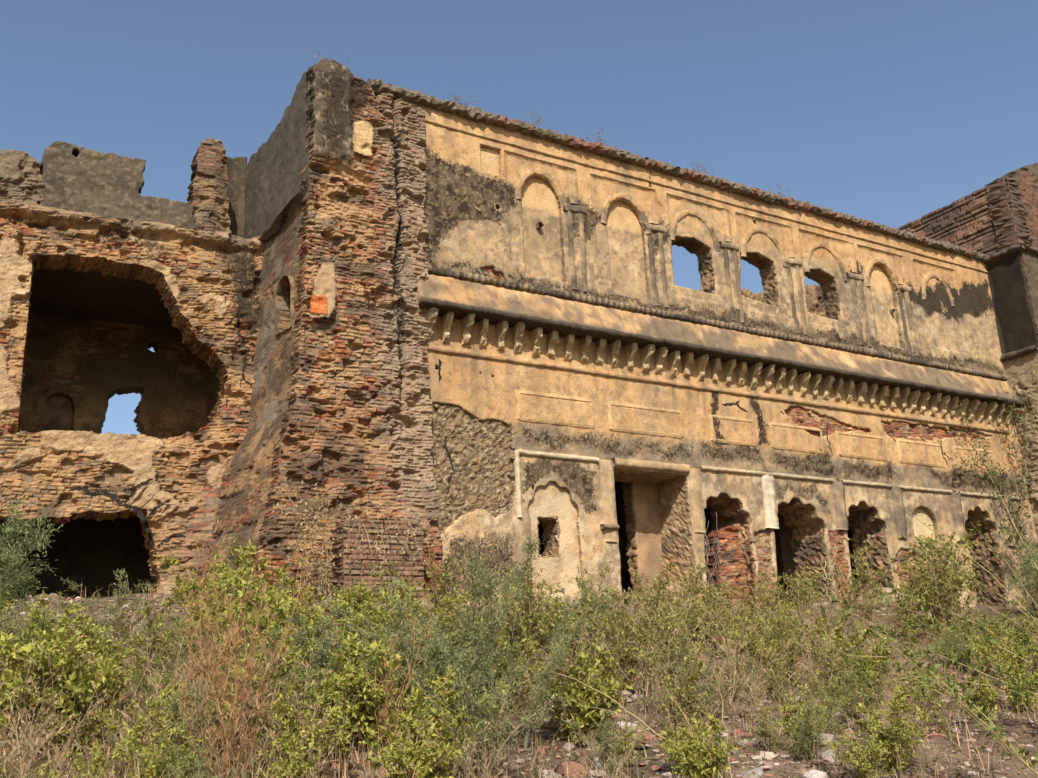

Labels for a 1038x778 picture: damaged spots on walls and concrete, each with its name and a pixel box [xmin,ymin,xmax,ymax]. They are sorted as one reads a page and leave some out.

flaking render [309,262,338,318]
crack [389,124,408,384]
water stain [508,268,1004,376]
water stain [897,252,1038,353]
flaking render [431,402,517,534]
water stain [521,391,897,525]
flaking render [780,406,869,437]
flaking render [881,420,989,441]